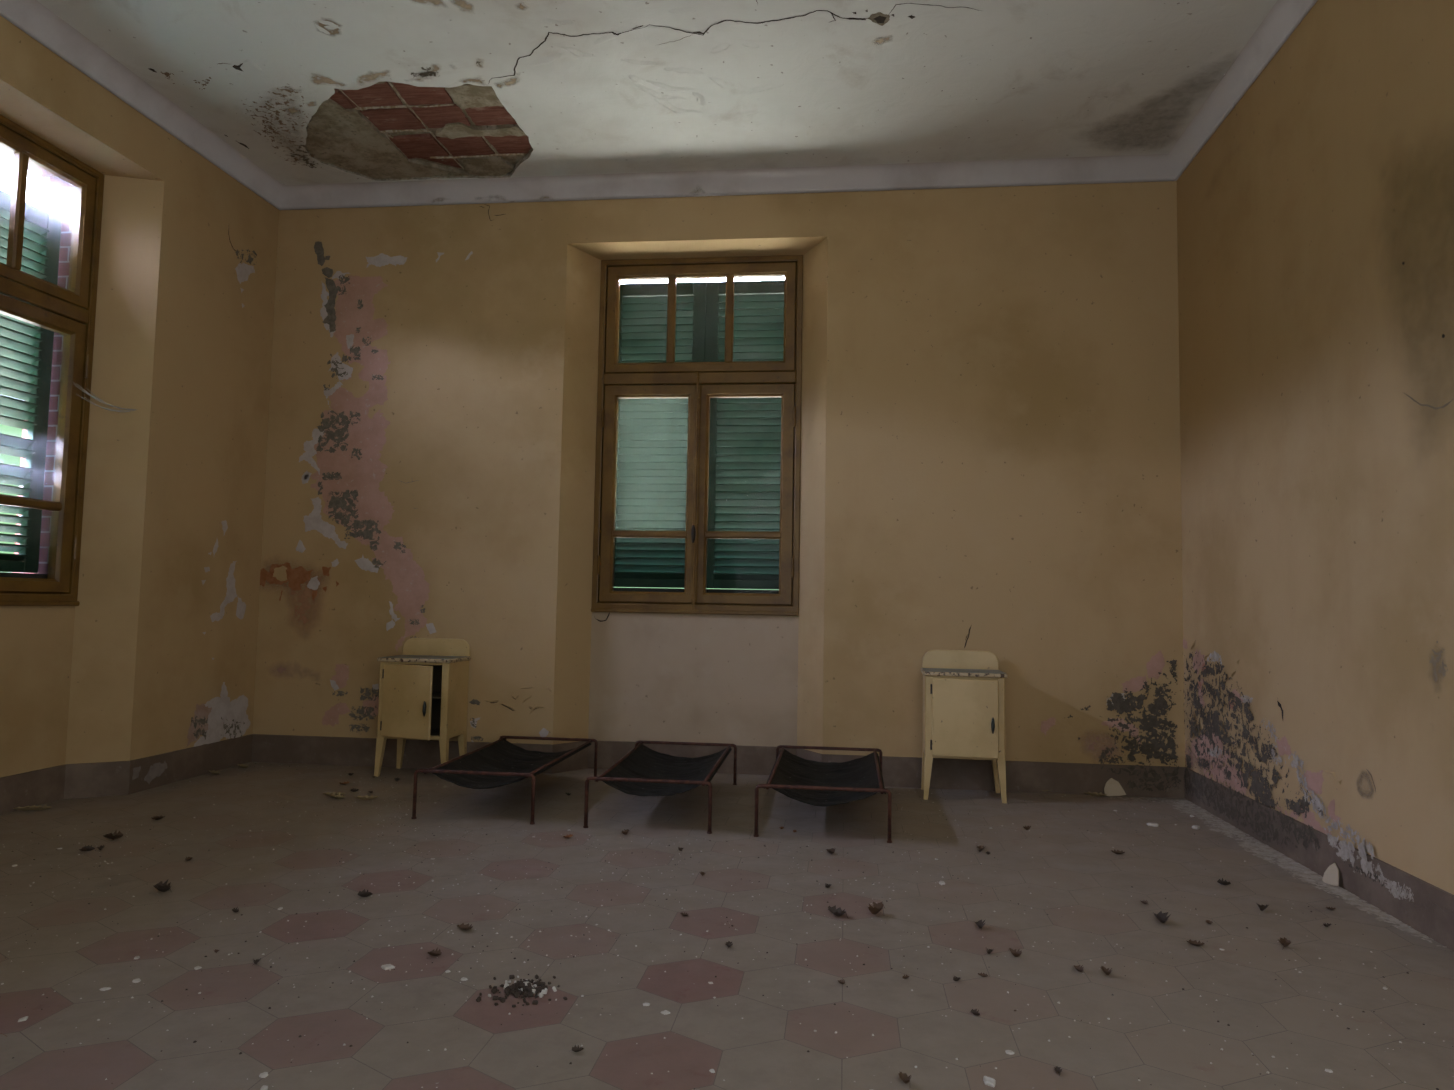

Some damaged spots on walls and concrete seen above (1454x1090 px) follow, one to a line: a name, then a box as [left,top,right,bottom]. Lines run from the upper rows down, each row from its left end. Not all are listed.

crack [489,0,979,82]
spalling [241,81,533,181]
peeling [296,241,436,651]
peeling [187,682,251,747]
damp [1041,639,1445,947]